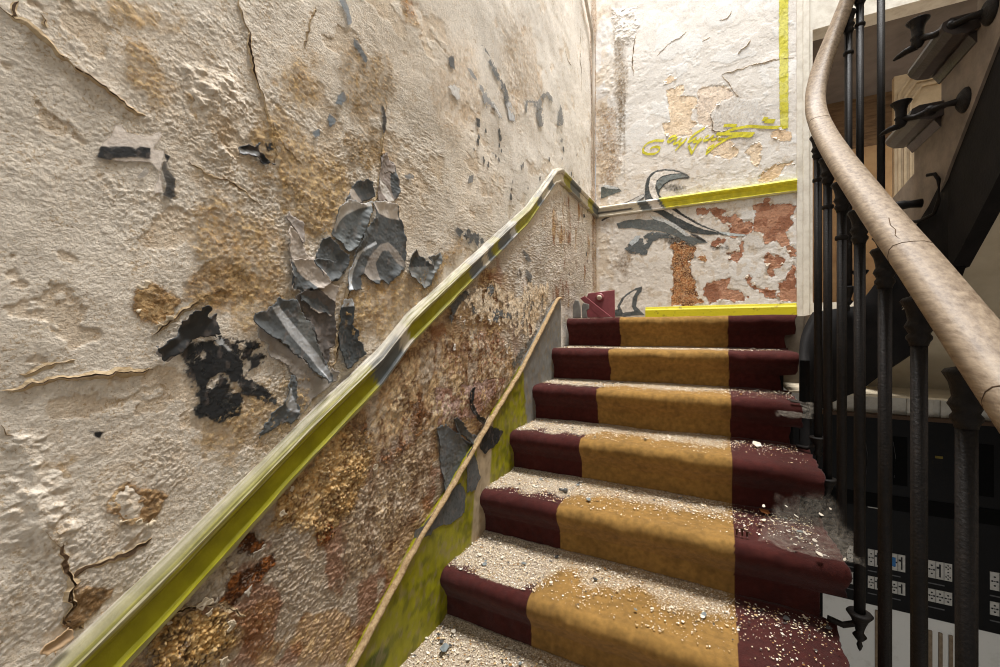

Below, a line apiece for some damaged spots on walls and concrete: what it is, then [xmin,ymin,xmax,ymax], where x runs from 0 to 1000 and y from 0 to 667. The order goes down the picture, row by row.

crack [0,1,146,116]
crack [237,0,302,164]
peeling [97,125,176,199]
water stain [253,117,385,233]
water stain [188,199,283,331]
peeling [132,153,443,439]
spalling [670,198,797,306]
crack [1,359,153,393]
spalling [269,250,550,585]
crack [46,532,152,631]
corrosion [212,532,276,606]
corrosion [316,522,336,547]